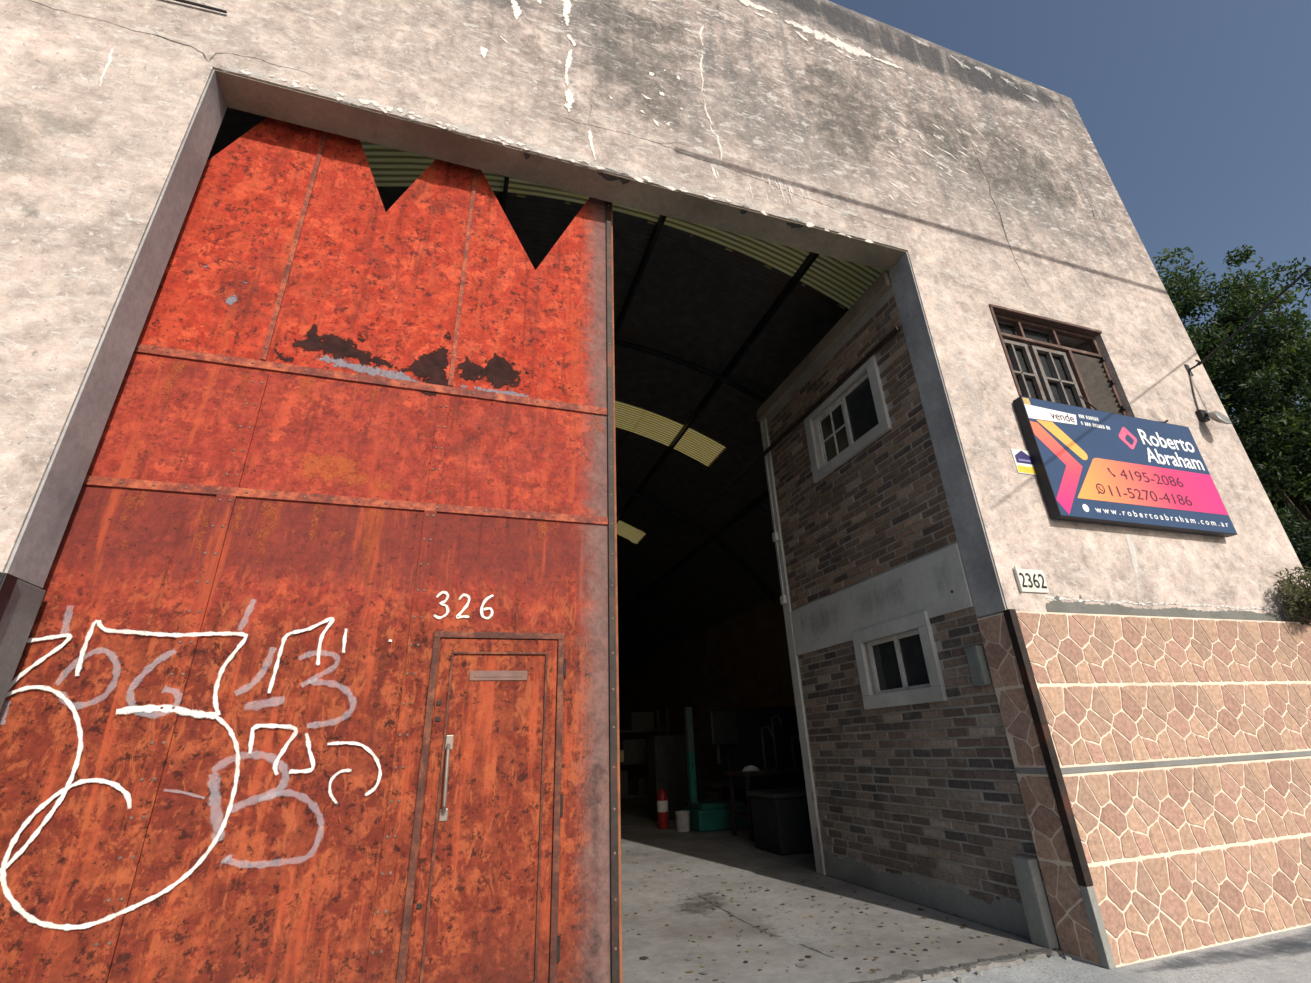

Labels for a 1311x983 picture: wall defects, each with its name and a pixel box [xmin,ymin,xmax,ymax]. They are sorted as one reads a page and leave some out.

crack [29,0,309,74]
peeling [511,0,522,19]
damp [785,0,1064,106]
rust [274,324,529,397]